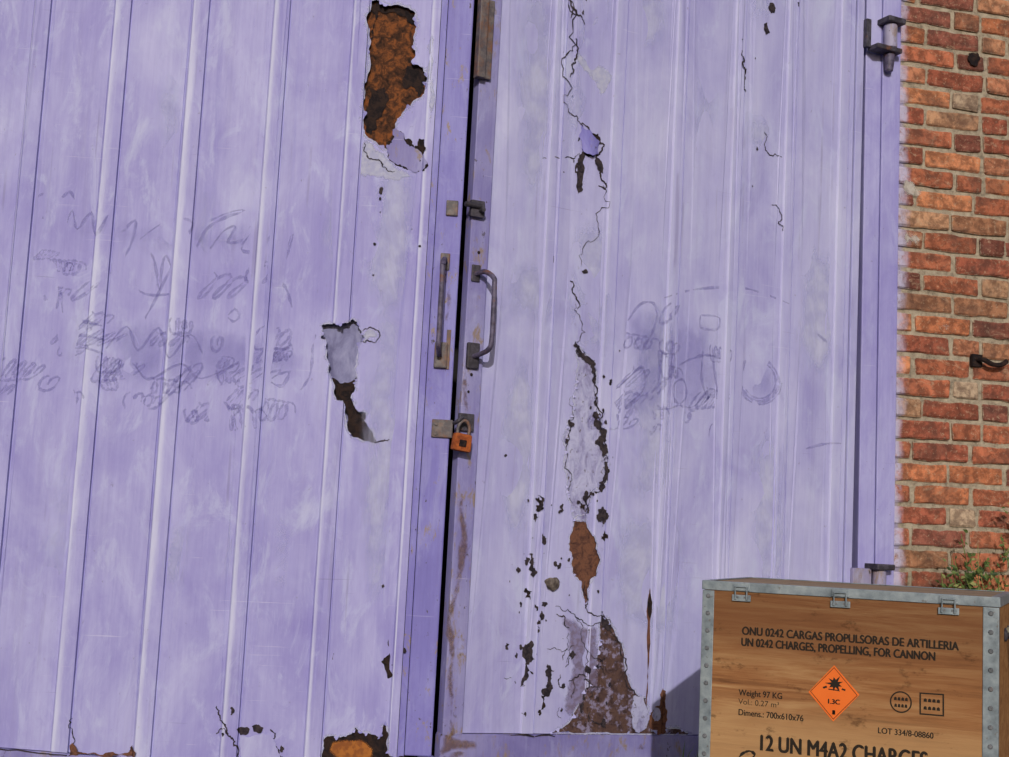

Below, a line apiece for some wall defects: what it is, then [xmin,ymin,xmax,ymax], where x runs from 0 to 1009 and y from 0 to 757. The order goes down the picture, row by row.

peeling [379,128,427,173]
crack [544,0,611,355]
peeling [528,342,612,541]
peeling [516,553,537,577]
peeling [505,588,646,728]
corrosion [550,514,692,735]
corrosion [321,721,404,757]